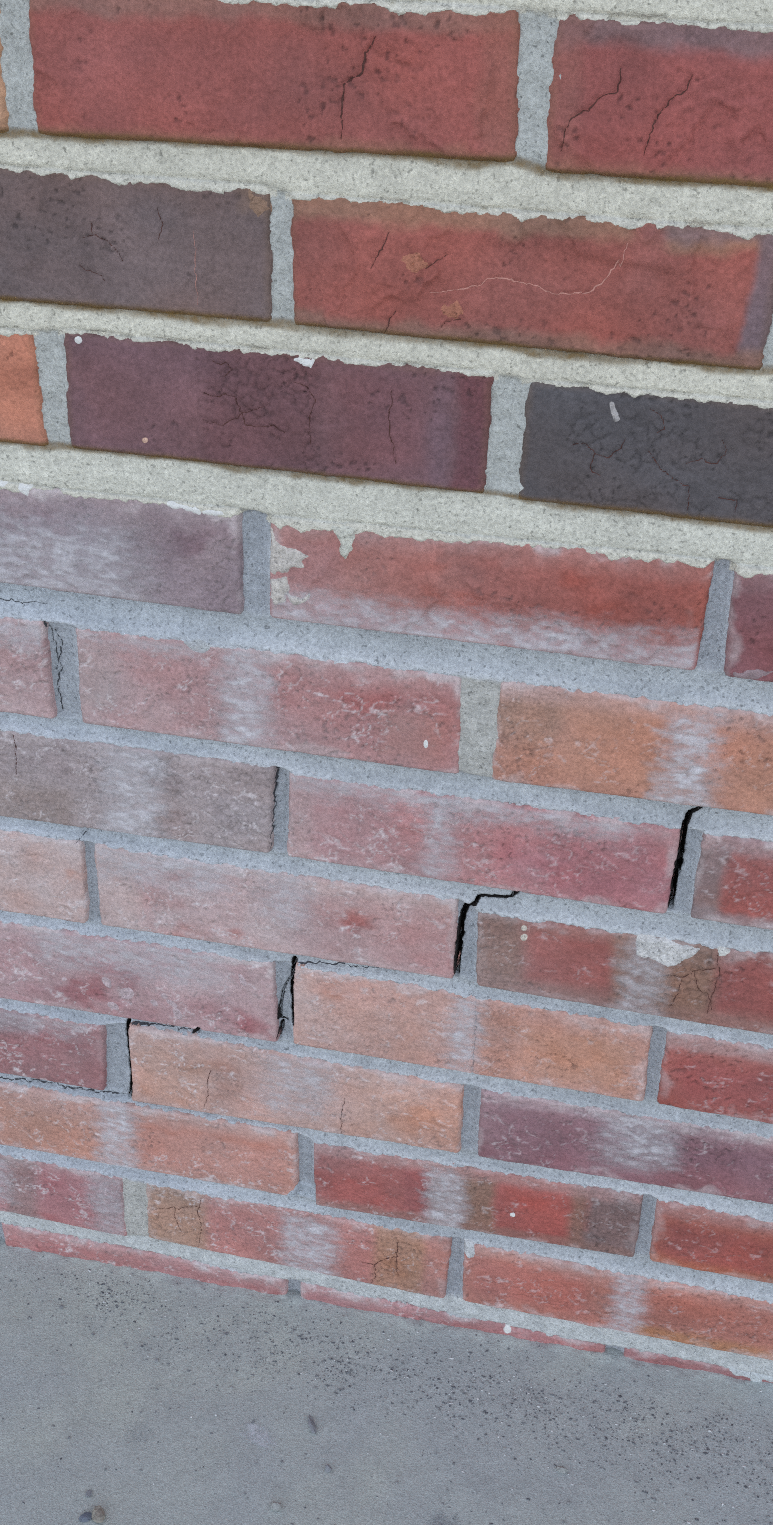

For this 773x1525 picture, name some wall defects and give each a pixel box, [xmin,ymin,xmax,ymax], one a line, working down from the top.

crack [270,766,280,848]
crack [669,806,702,905]
crack [454,891,519,973]
crack [277,956,379,1037]
crack [664,955,720,1012]
crack [0,1018,200,1096]